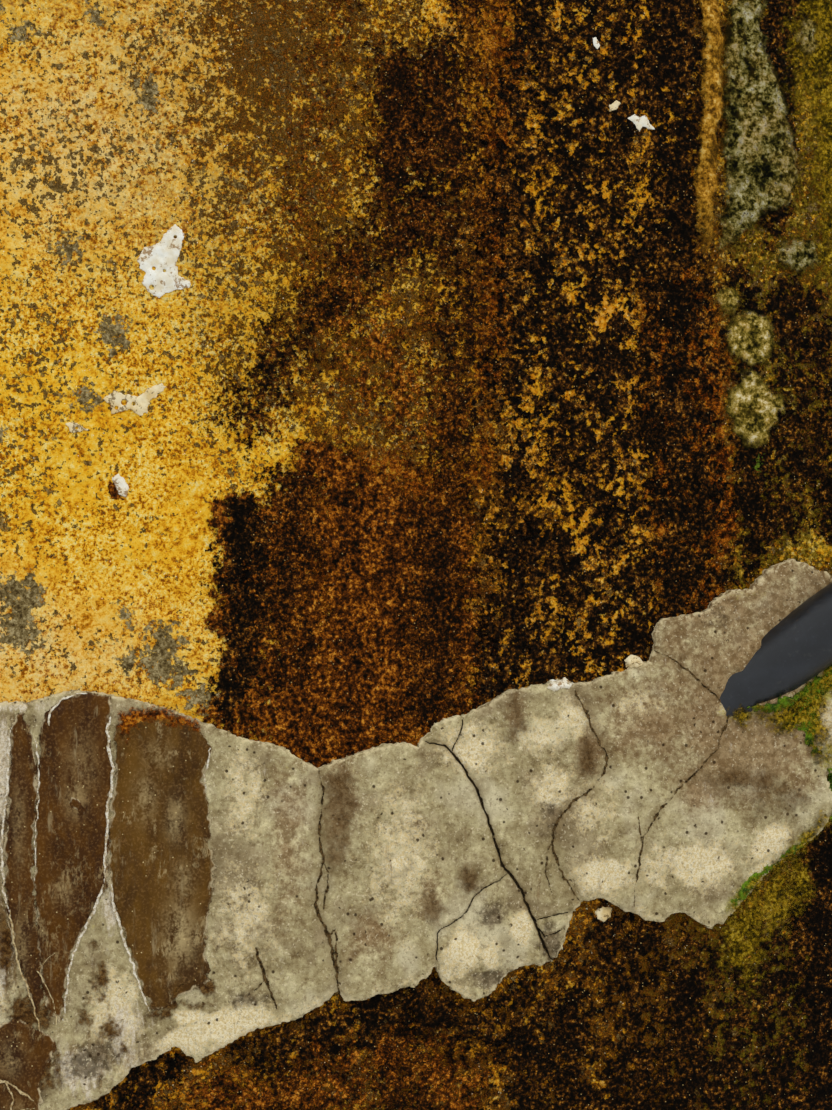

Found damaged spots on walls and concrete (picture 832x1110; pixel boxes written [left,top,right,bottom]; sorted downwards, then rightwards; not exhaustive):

peeling [0,1,41,47]
flaking render [62,376,165,433]
peeling [92,308,136,360]
flaking render [137,224,191,298]
rust [270,0,530,766]
water stain [193,0,832,868]
rust [632,251,742,615]
crack [9,910,57,1031]
rust [117,705,200,744]
crack [314,770,340,995]
crack [425,690,609,960]
crack [634,650,744,906]